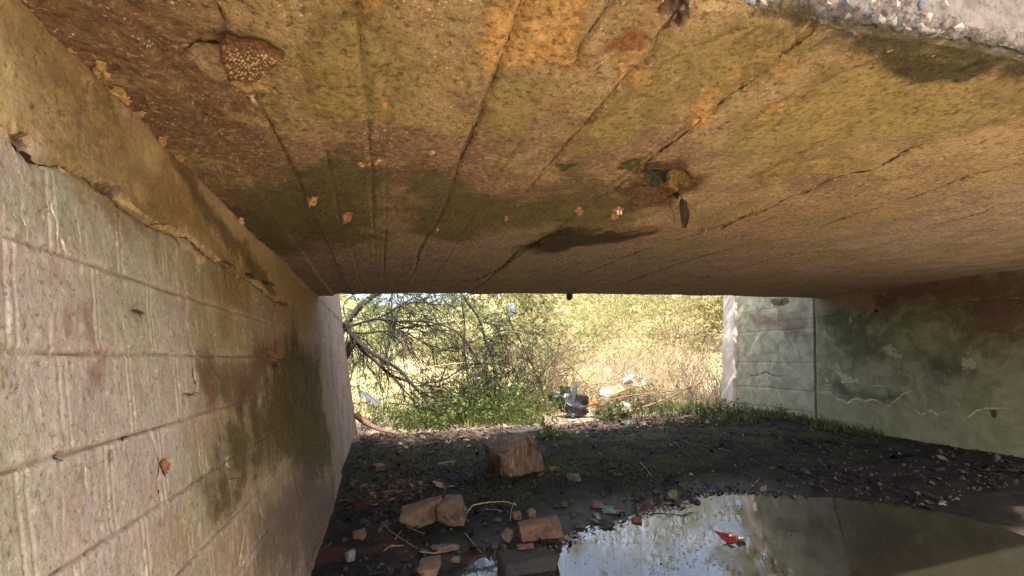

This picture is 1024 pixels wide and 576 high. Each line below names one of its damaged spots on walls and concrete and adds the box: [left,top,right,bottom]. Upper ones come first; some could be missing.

crack [576,1,609,60]
spalling [745,0,1024,50]
crack [452,8,518,186]
crack [527,12,675,191]
spalling [9,131,35,152]
spalling [88,182,121,196]
damp [520,227,658,255]
crack [586,140,1019,290]
damp [257,461,335,572]